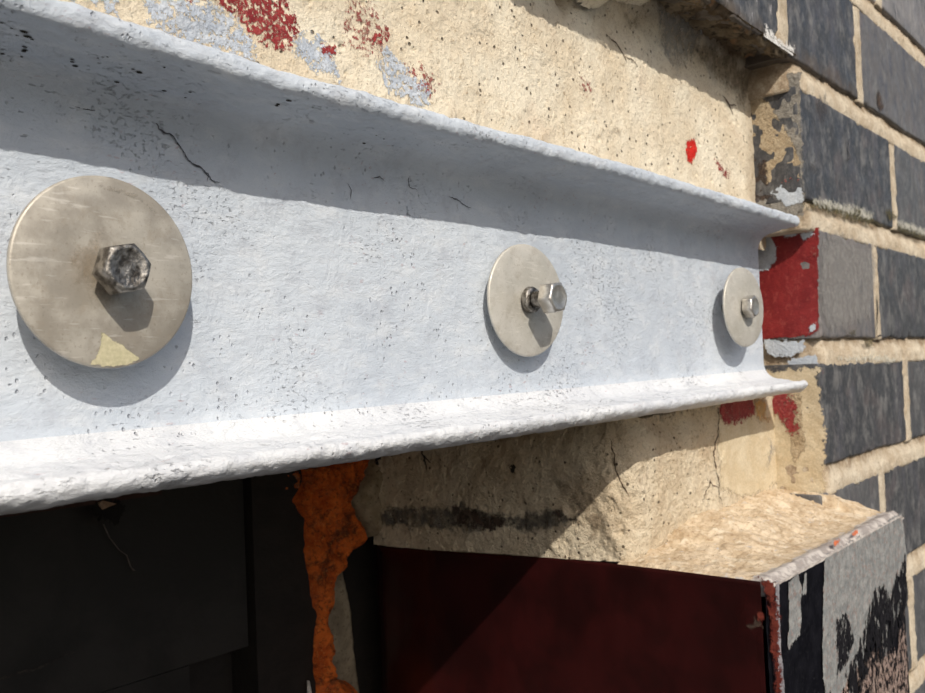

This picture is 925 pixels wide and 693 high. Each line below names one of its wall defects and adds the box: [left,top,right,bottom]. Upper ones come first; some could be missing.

peeling [205,0,302,51]
peeling [320,0,441,108]
crack [156,123,220,183]
peeling [758,237,777,271]
peeling [787,354,824,371]
crack [704,407,721,499]
leakage [380,502,580,532]
peeling [788,573,807,650]
peeling [822,513,909,693]